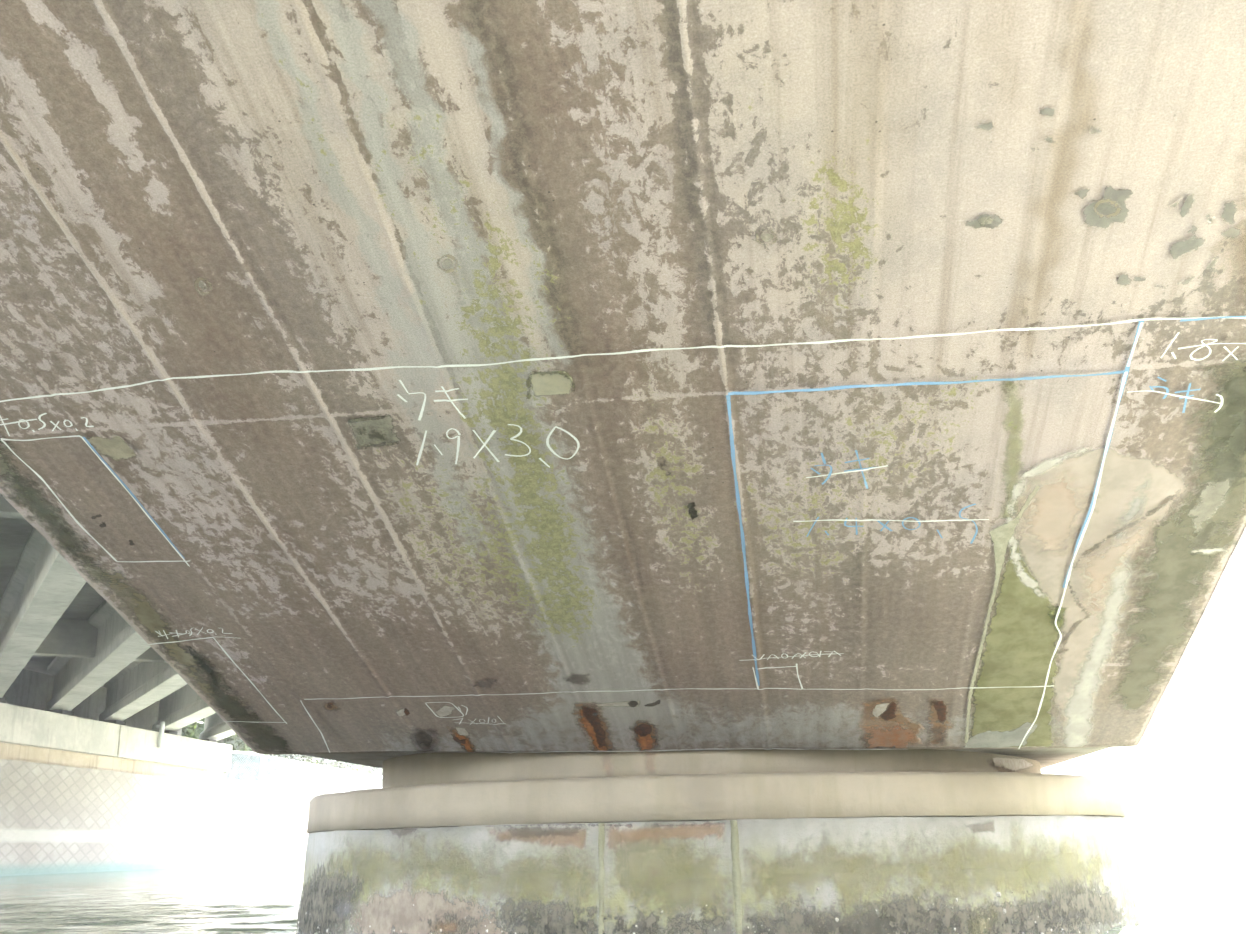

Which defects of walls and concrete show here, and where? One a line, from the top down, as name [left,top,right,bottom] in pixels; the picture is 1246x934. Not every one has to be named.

water stain [1007,448,1187,747]
water stain [567,675,588,684]
corrosion [447,726,475,752]
corrosion [572,703,615,752]
corrosion [631,720,658,751]
corrosion [859,698,952,749]
water stain [498,827,585,847]